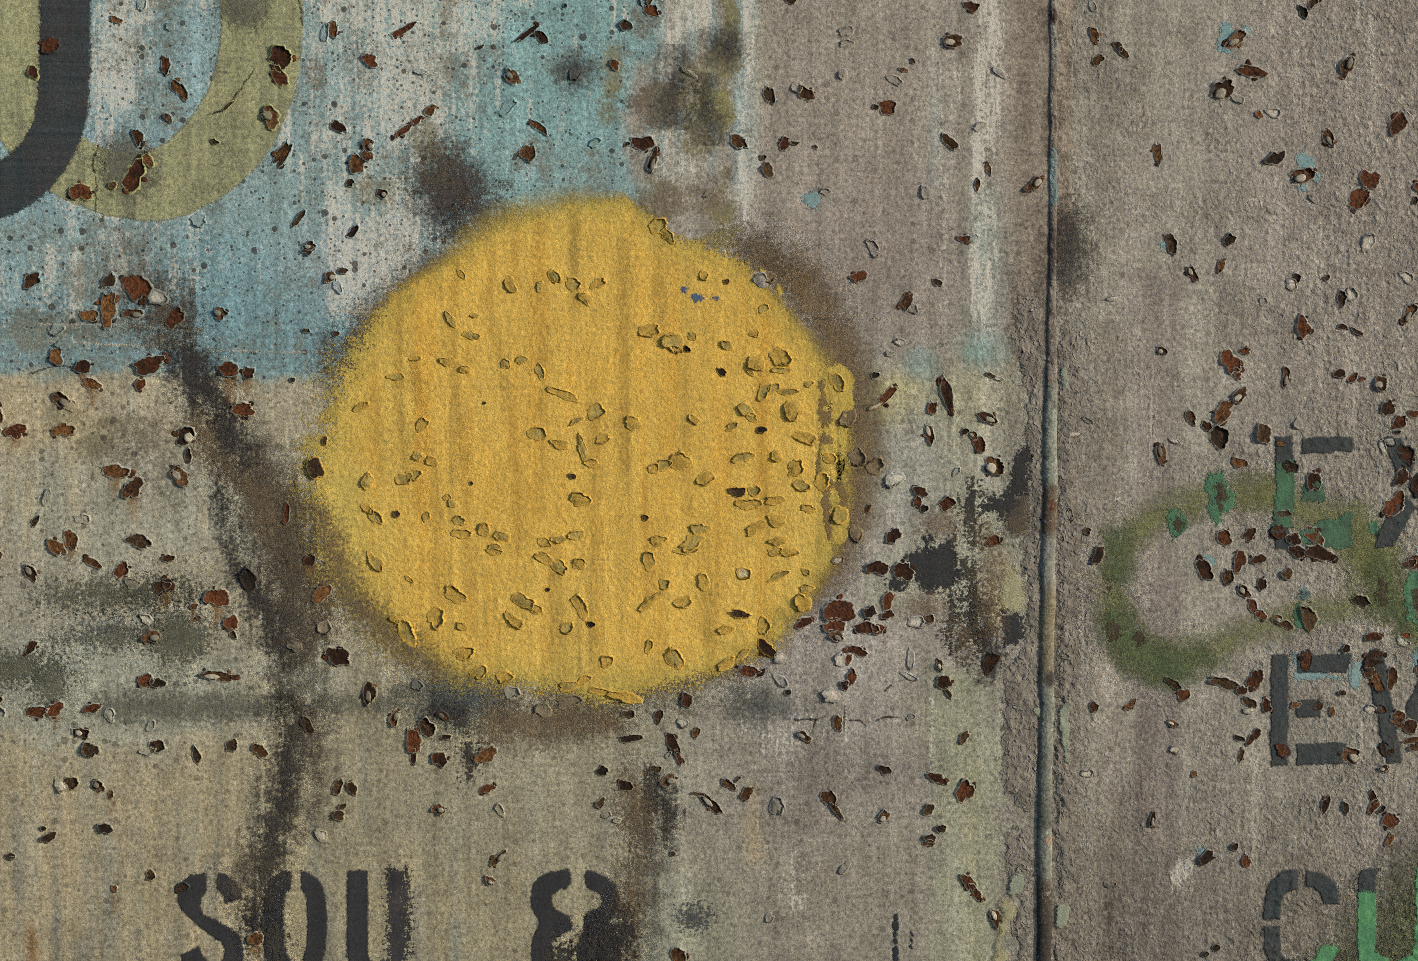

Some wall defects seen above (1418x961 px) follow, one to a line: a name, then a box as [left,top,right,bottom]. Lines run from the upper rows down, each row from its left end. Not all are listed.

peeling [1209,76,1236,102]
peeling [1263,149,1318,185]
peeling [1163,232,1200,282]
peeling [1184,409,1230,451]
peeling [167,425,197,489]
peeling [304,435,328,480]
peeling [817,363,883,565]
peeling [981,455,1005,477]
peeling [122,531,153,551]
leakage [163,327,783,961]
peeling [71,727,102,758]
peeling [649,765,742,815]